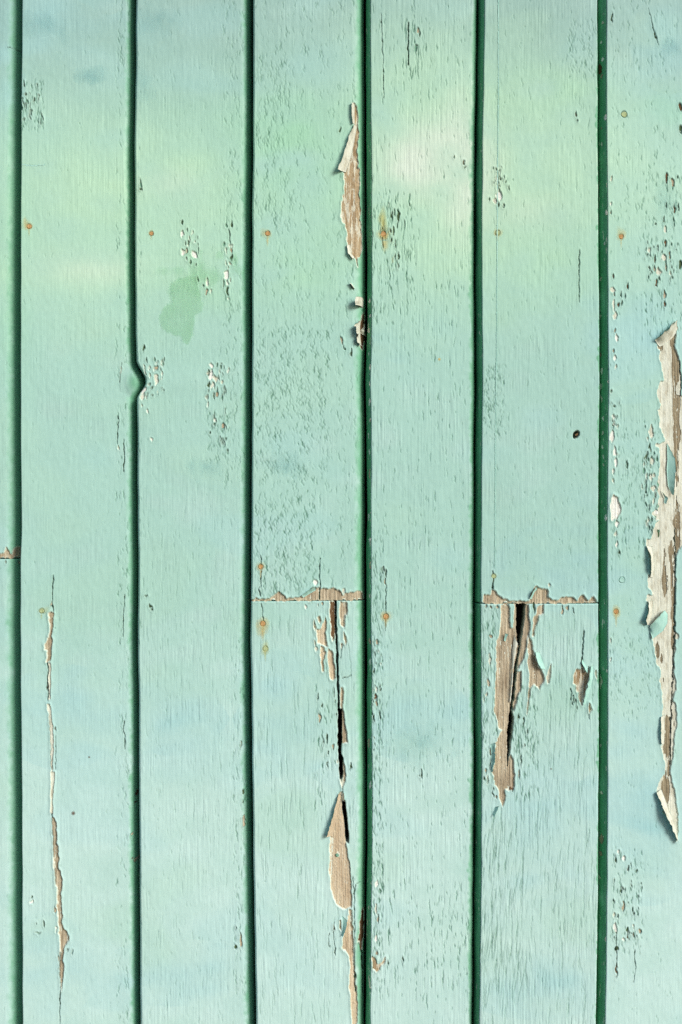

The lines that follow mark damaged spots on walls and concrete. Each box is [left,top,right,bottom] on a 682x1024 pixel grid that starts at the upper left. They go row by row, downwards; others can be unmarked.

peeling [338,102,362,266]
peeling [641,321,682,840]
peeling [483,583,603,817]
peeling [327,792,385,1024]